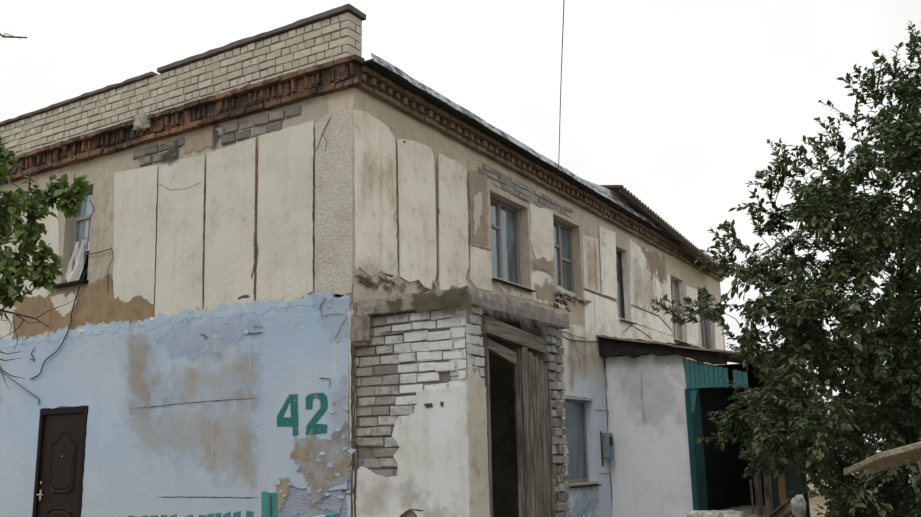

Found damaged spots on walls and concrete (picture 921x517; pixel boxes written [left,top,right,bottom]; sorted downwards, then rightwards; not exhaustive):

crack [237,141,258,300]
flaking render [468,163,573,246]
flaking render [12,274,155,340]
peeling [276,397,356,517]